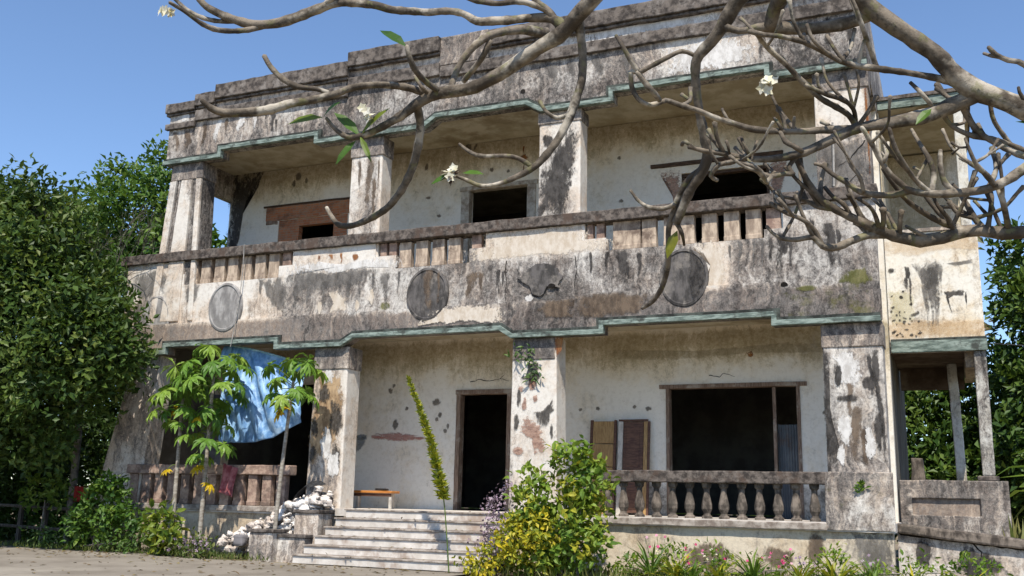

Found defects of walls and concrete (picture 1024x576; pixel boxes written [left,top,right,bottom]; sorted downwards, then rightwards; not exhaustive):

water stain [173,124,207,150]
water stain [537,130,581,216]
water stain [259,268,400,312]
water stain [418,270,506,326]
water stain [538,293,646,317]
water stain [589,250,642,280]
water stain [689,248,705,301]
water stain [888,259,972,337]
water stain [310,385,343,466]
flaking render [512,379,545,455]
water stain [822,349,886,472]